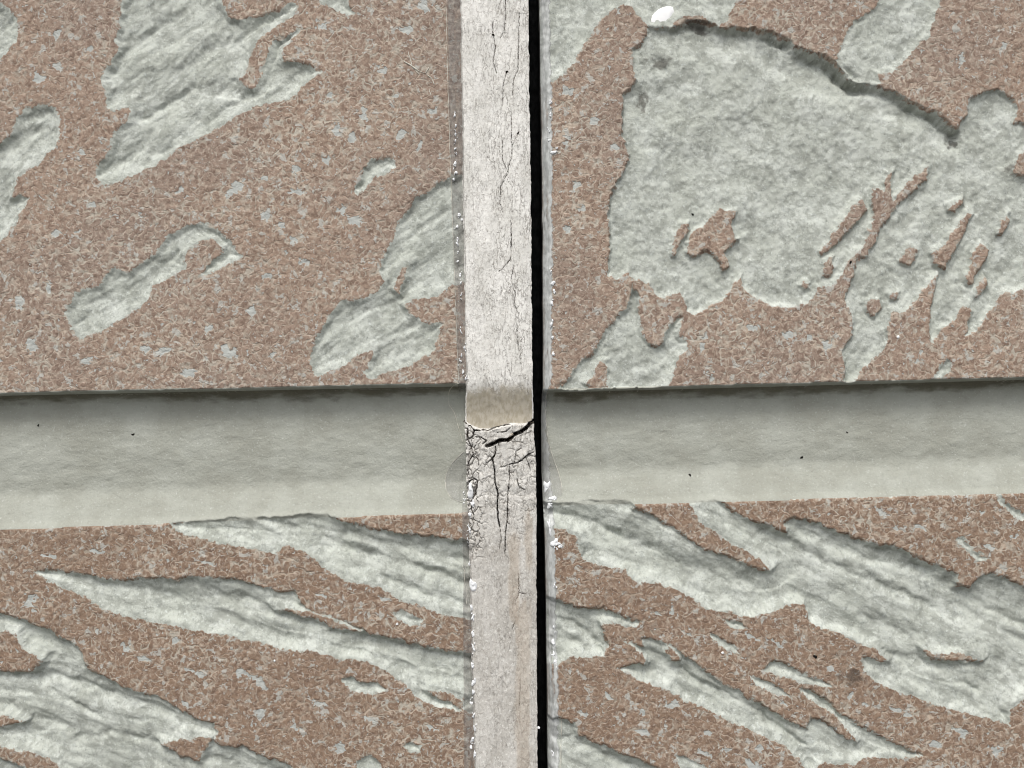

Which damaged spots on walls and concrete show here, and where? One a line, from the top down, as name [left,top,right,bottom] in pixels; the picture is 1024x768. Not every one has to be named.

spalling [0,101,61,243]
spalling [64,222,243,340]
spalling [95,0,323,187]
spalling [309,111,465,380]
spalling [540,0,1024,389]
crack [463,420,534,552]
spalling [0,613,293,768]
spalling [34,483,477,758]
spalling [355,754,382,768]
spalling [546,582,924,768]
spalling [543,481,1024,726]